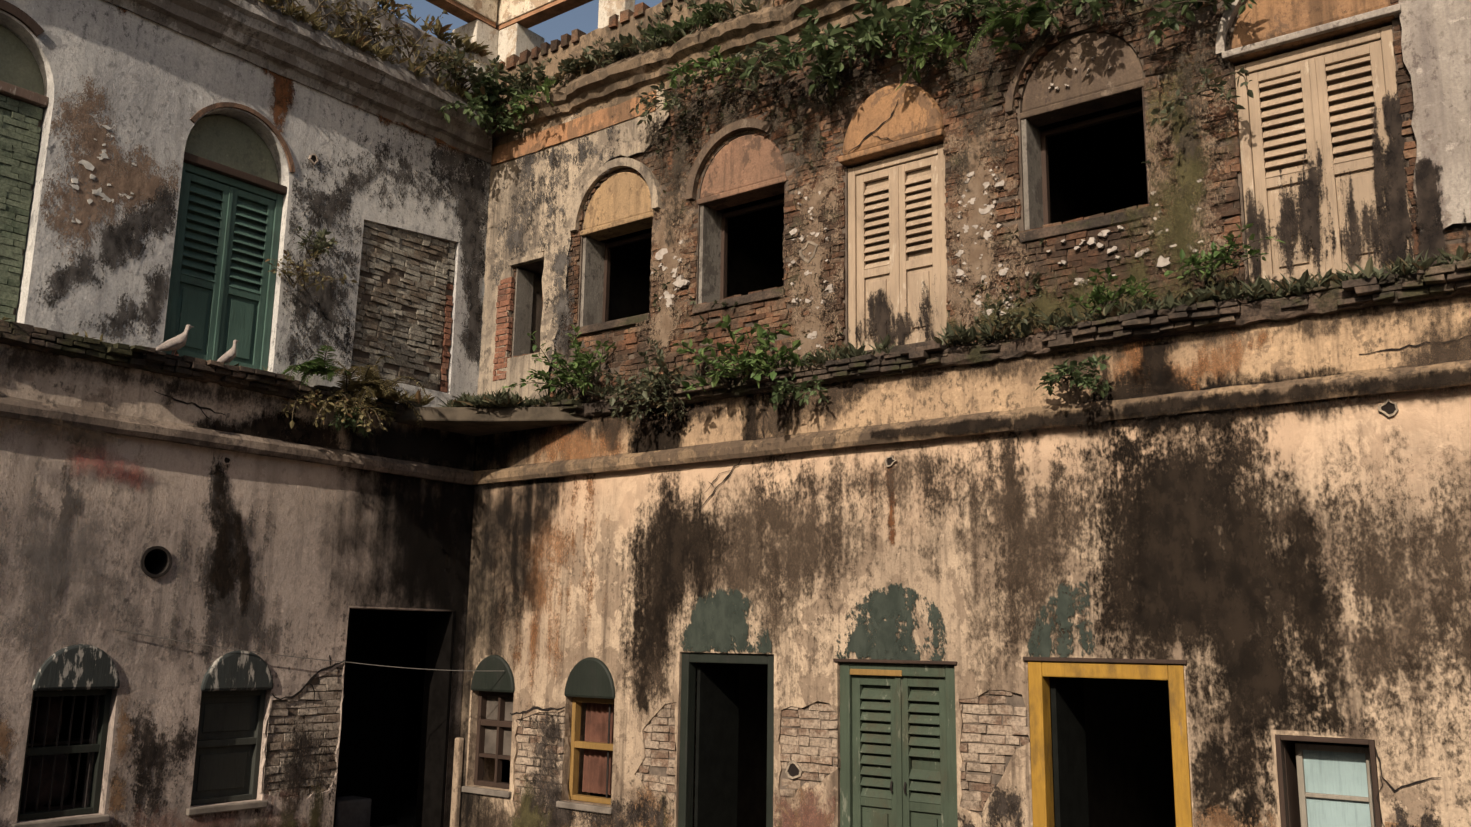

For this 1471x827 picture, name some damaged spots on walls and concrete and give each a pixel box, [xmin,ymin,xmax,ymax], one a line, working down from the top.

peeling [39,74,181,262]
crack [849,99,899,152]
water stain [1242,89,1469,281]
water stain [0,414,292,682]
water stain [566,299,1471,827]
water stain [107,692,198,827]
water stain [252,702,338,827]
flaking render [263,664,344,805]
crack [272,655,345,705]
flaking render [636,702,677,802]
flaking render [780,701,838,798]
flaking render [959,690,1030,814]